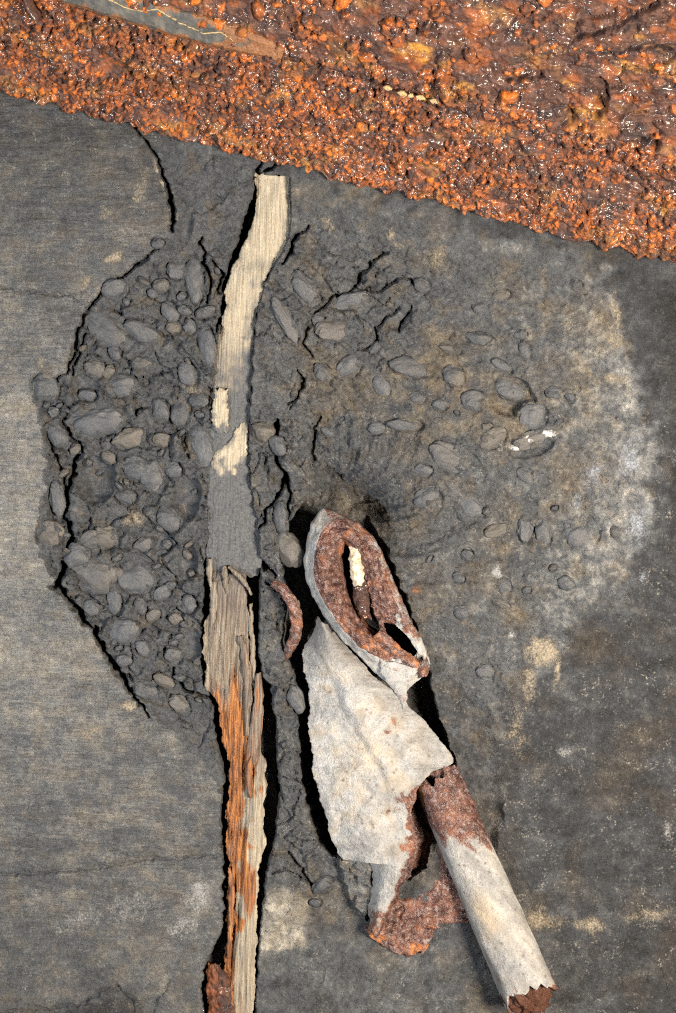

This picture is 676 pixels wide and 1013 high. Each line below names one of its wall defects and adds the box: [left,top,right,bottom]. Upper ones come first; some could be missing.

rust [0,0,676,263]
crack [247,251,414,1013]
spalling [32,141,665,929]
rust [313,521,420,664]
crack [0,666,230,1013]